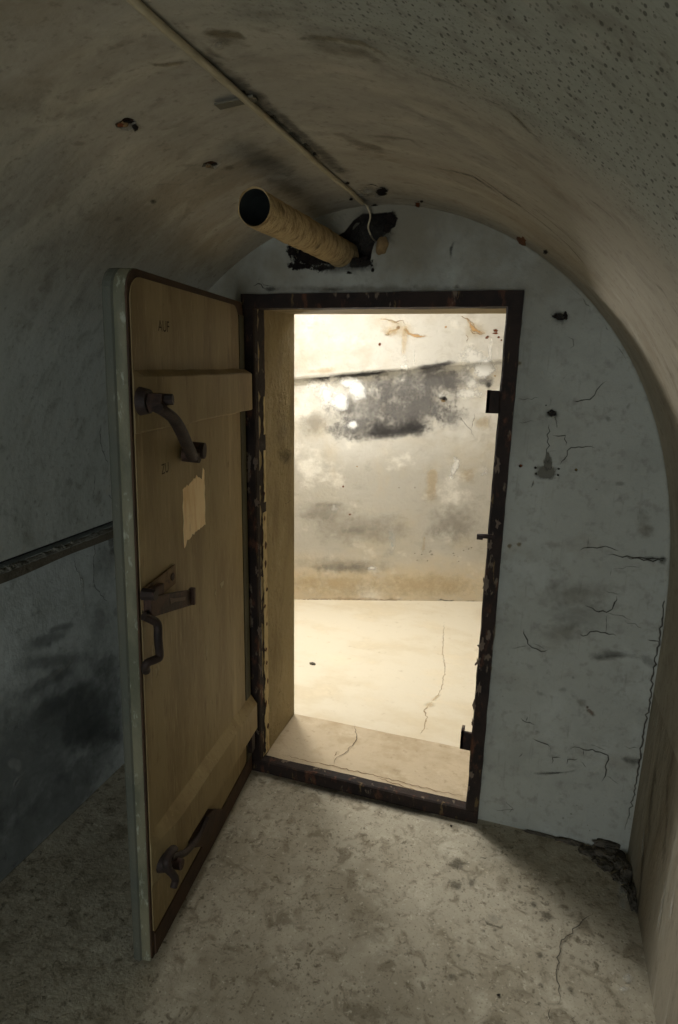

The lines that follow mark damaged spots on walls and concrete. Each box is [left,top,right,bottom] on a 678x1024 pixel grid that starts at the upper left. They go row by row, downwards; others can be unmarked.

spalling [117,118,138,131]
spalling [339,184,397,260]
damp [336,355,462,439]
crack [581,546,663,569]
crack [521,592,665,824]
crack [290,729,454,795]
spalling [522,829,637,914]
crack [548,917,587,1019]